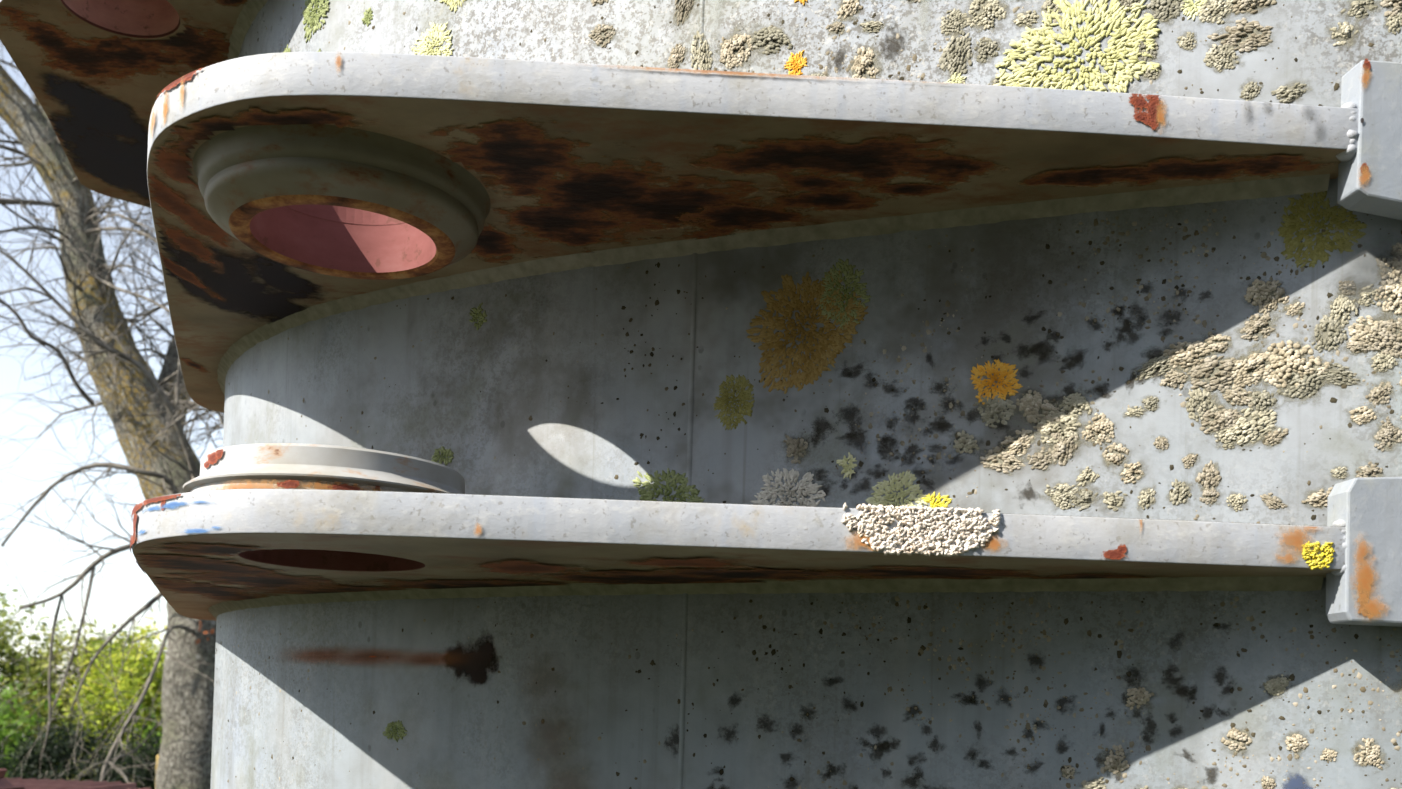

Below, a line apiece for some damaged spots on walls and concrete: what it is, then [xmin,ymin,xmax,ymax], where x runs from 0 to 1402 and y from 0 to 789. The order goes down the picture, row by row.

rust [1129,93,1166,130]
rust [0,6,358,301]
rust [429,118,1006,263]
rust [1019,155,1331,187]
rust [204,449,223,468]
rust [223,479,381,491]
rust [130,494,1153,601]
rust [1278,526,1317,563]
rust [1355,541,1385,618]
rust [299,636,498,685]